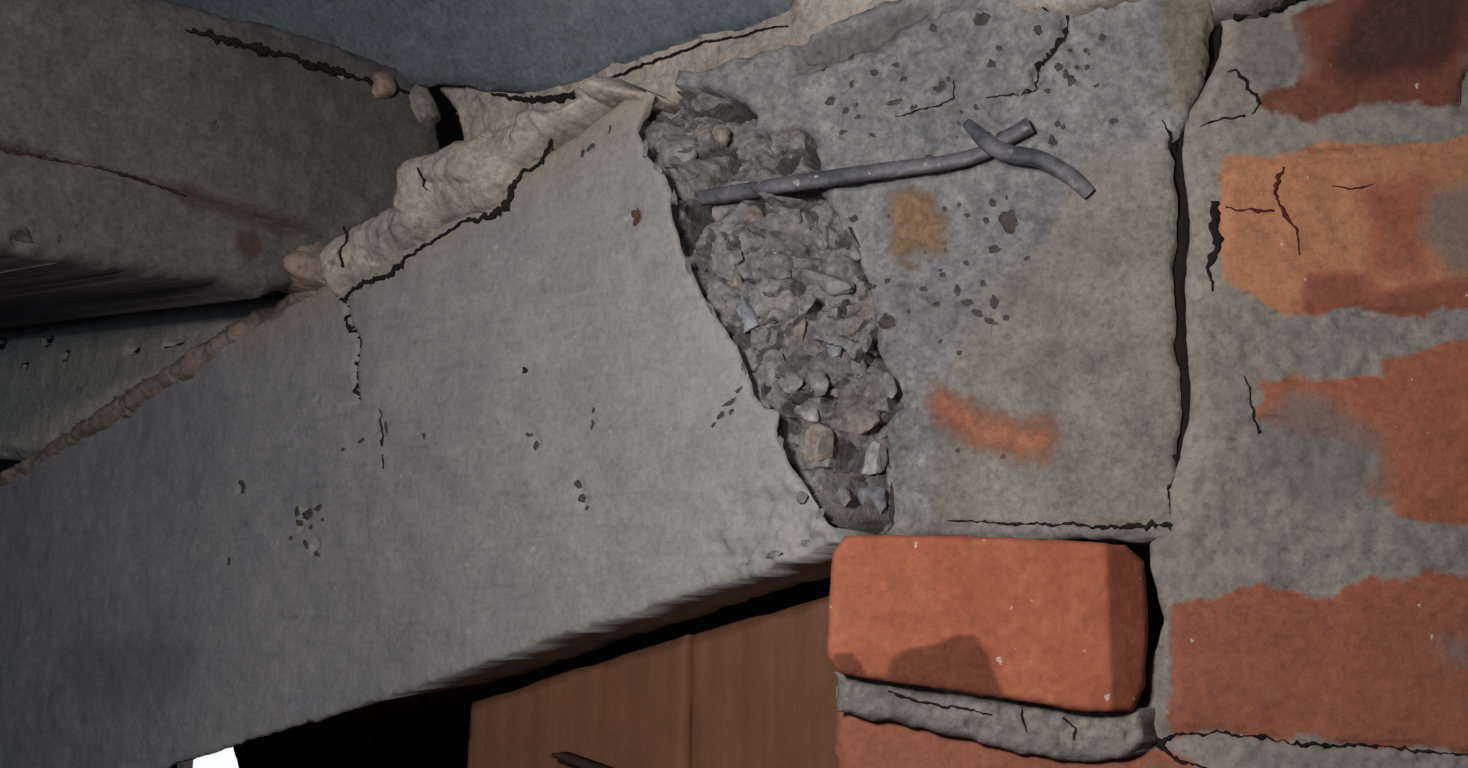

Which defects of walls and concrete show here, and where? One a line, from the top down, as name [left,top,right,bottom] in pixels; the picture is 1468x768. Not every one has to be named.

crack [185,28,410,94]
crack [610,25,789,78]
crack [491,90,576,104]
spalling [825,62,917,135]
spalling [631,207,642,226]
rust [891,190,945,266]
spalling [942,195,1018,254]
crack [338,139,553,469]
spalling [639,91,904,534]
spalling [919,268,1010,325]
crack [948,0,1302,531]
crack [1153,729,1468,768]